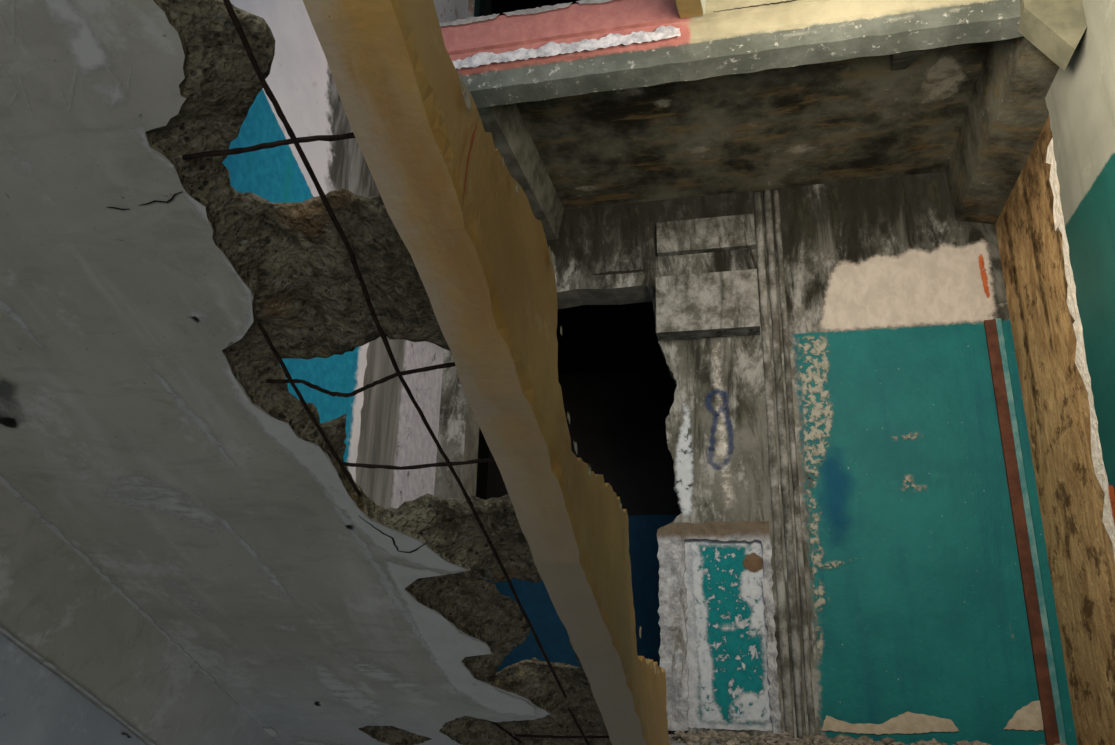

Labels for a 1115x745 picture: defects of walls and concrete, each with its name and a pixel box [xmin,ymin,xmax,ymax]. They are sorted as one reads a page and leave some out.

peeling [44,0,108,73]
peeling [452,25,681,110]
peeling [922,56,964,102]
spalling [136,0,612,745]
peeling [798,240,996,659]
peeling [684,539,773,731]
peeling [822,712,959,735]
peeling [1004,700,1044,731]